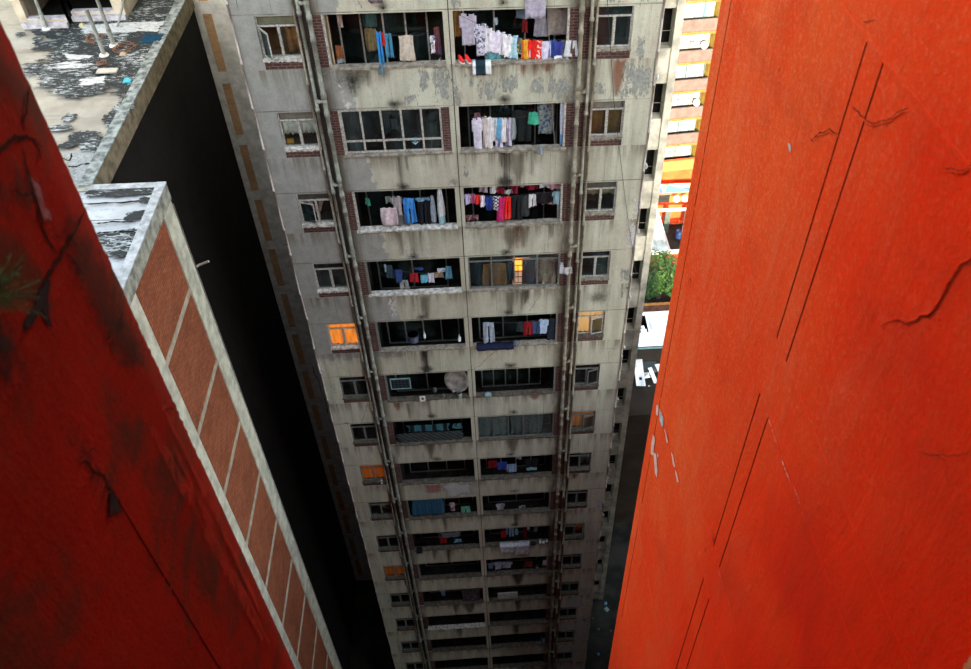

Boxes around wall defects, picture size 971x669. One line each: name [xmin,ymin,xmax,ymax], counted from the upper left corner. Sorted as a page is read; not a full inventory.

peeling [619,35,657,99]
crack [811,128,838,143]
crack [852,107,911,128]
crack [943,164,971,175]
crack [0,85,139,328]
crack [880,256,971,327]
crack [80,447,111,491]
peeling [651,405,679,483]